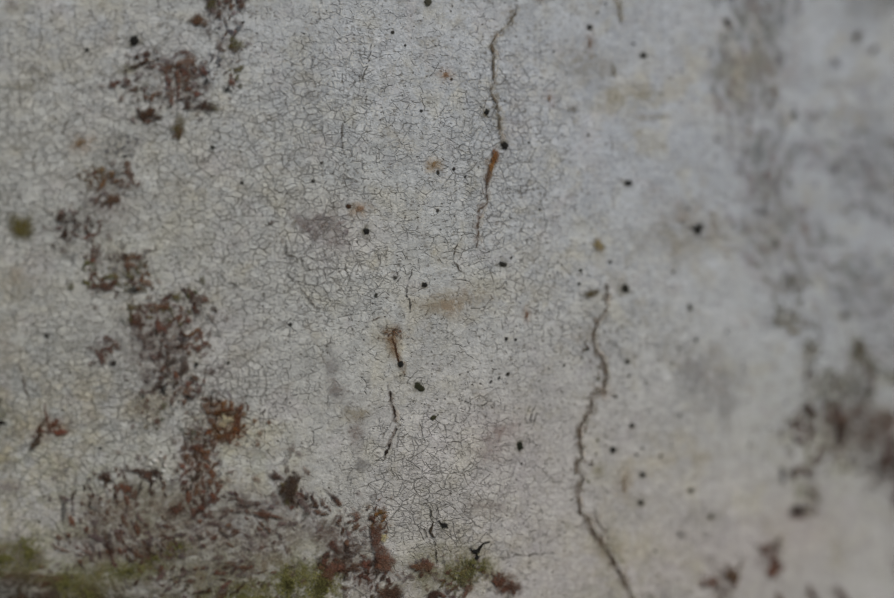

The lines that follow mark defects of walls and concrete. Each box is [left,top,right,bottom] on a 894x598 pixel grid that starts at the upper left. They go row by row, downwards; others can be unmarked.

crack [489,6,520,142]
rust [487,149,499,186]
crack [454,168,492,272]
crack [285,241,351,309]
crack [374,317,406,375]
crack [385,391,401,457]
crack [574,283,651,598]
crack [424,503,447,562]